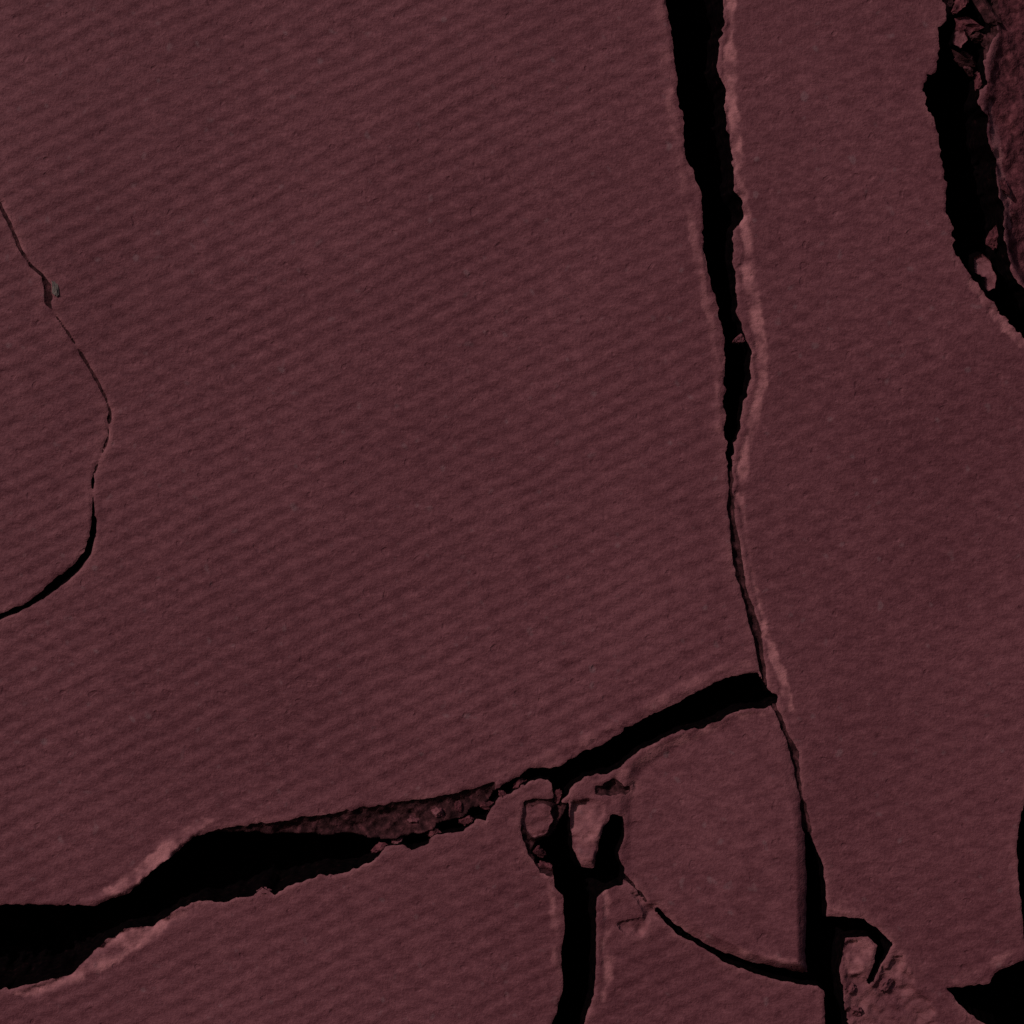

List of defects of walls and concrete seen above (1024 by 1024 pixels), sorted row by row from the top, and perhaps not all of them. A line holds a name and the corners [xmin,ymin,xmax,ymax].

crack [922,0,1024,350]
crack [0,202,112,620]
crack [653,0,797,724]
crack [0,658,935,1024]
crack [947,806,1024,1024]